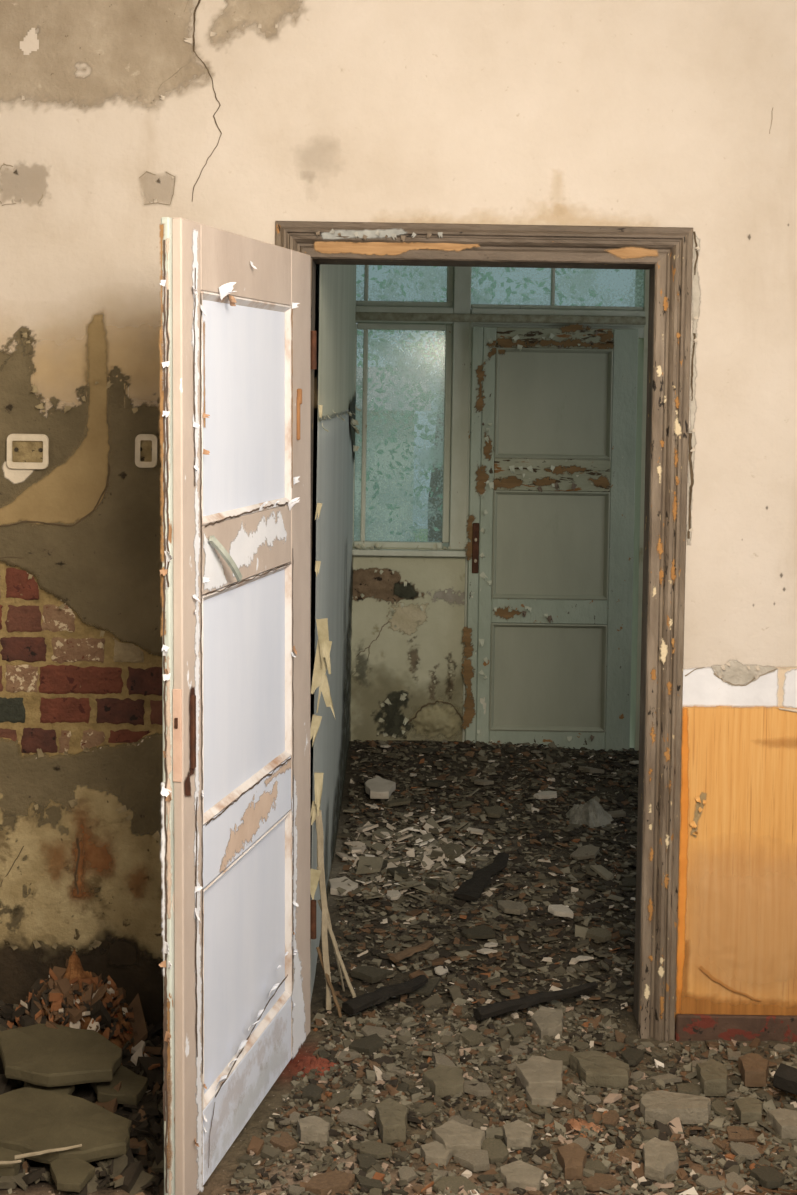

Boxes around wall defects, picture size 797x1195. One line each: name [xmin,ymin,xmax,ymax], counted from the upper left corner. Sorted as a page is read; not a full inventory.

spalling [0,0,211,108]
crack [158,0,222,201]
spalling [210,0,302,44]
spalling [353,568,465,605]
spalling [0,326,172,968]
spalling [375,691,414,739]
peeling [408,637,454,699]
peeling [644,619,797,1019]